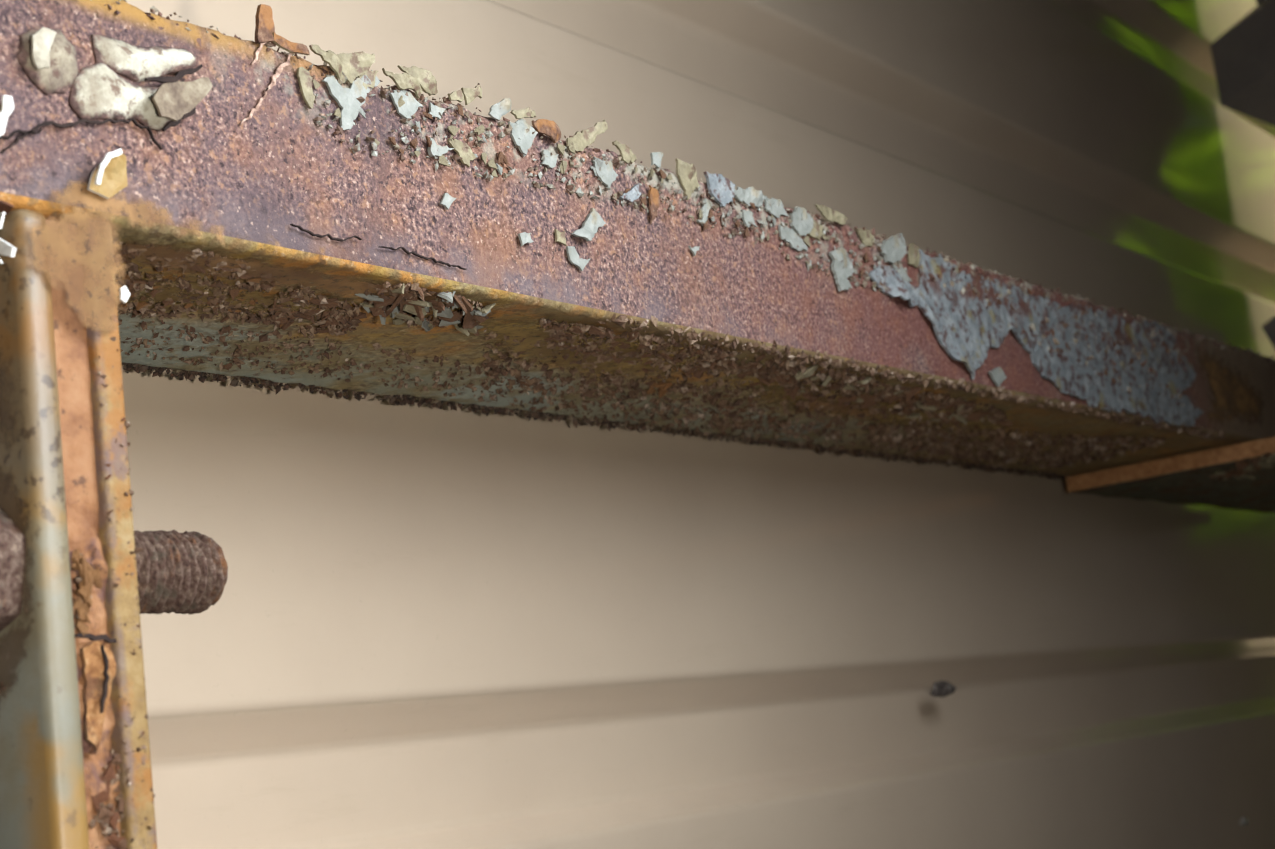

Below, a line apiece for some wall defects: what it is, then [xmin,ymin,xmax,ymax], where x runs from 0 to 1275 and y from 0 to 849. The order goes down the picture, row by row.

peeling [0,200,17,264]
peeling [87,148,128,199]
peeling [254,4,1204,427]
corrosion [0,468,33,696]